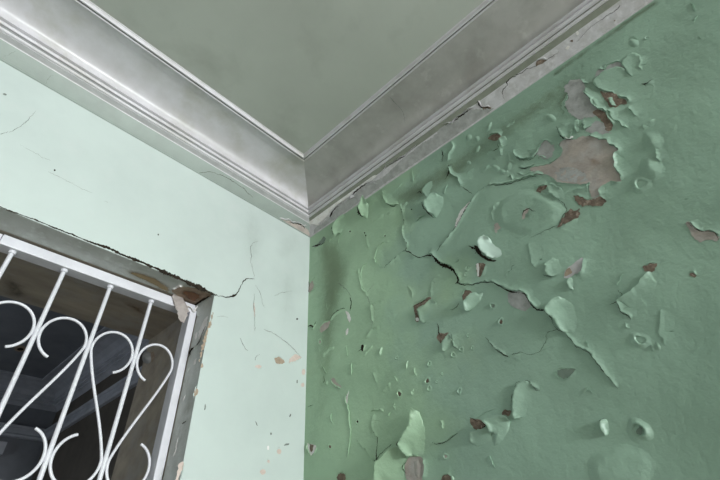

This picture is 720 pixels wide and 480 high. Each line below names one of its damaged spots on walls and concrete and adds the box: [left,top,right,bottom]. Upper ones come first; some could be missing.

spalling [281,105,494,237]
peeling [487,52,648,234]
crack [0,206,300,356]
spalling [172,284,213,373]
spalling [408,285,461,351]
peeling [469,235,502,277]
crack [385,185,622,389]
peeling [544,296,578,334]
peeling [612,260,657,328]
peeling [373,407,454,480]
peeling [469,378,540,447]
peeling [599,419,610,436]